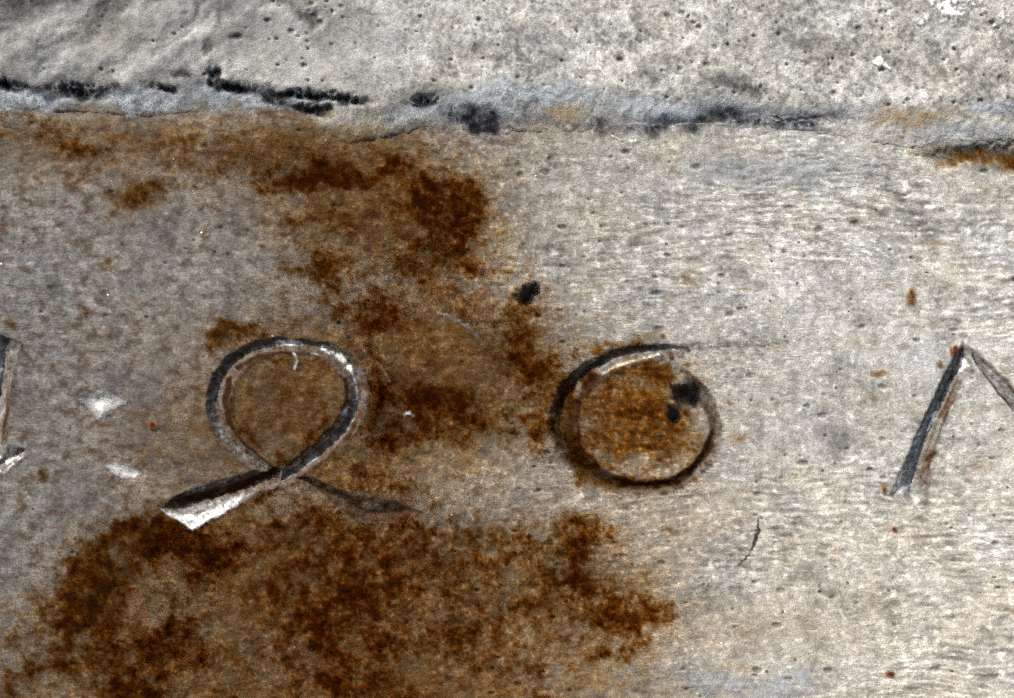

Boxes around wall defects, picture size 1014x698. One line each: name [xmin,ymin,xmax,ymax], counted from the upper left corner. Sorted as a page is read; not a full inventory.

rust [61,144,97,156]
rust [111,182,163,209]
rust [258,154,487,283]
rust [942,146,1014,169]
rust [207,318,265,349]
rust [283,250,398,335]
rust [367,300,708,489]
rust [354,464,407,493]
rust [4,506,262,698]
rust [244,504,674,698]